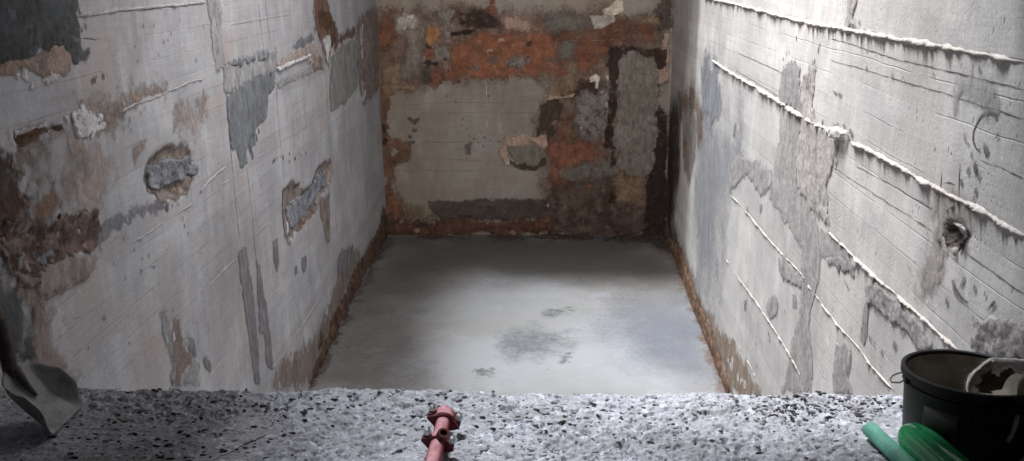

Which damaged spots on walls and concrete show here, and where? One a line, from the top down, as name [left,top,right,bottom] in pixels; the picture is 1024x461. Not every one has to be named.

flaking render [0,45,72,90]
flaking render [407,14,611,102]
damp [369,91,681,294]
hole [937,202,971,256]
spalling [0,208,103,379]
damp [329,319,412,383]